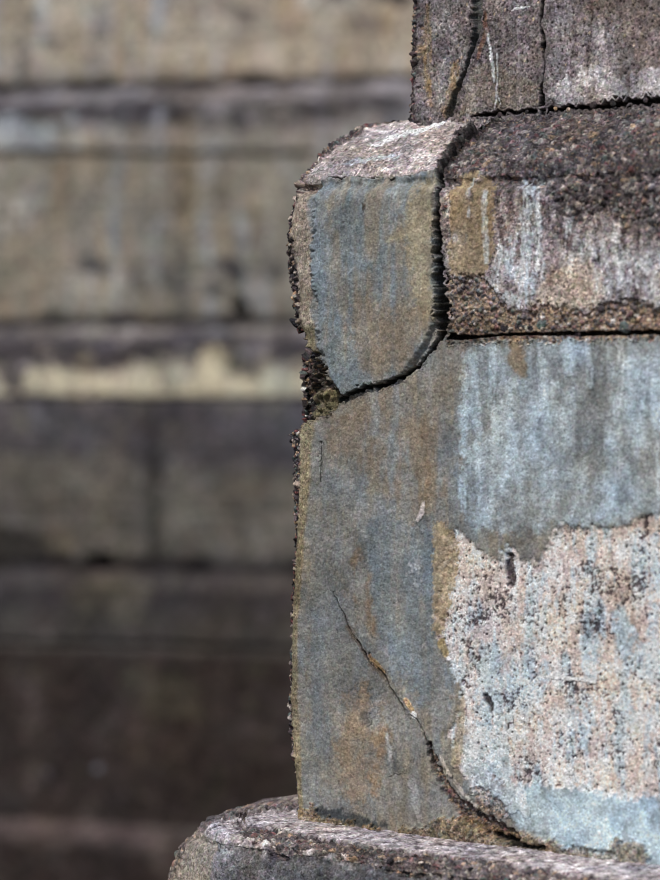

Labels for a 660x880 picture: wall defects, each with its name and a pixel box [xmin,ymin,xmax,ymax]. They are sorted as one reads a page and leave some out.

crack [536,0,552,117]
peeling [416,500,426,522]
crack [332,592,438,766]
peeling [395,512,660,864]
spalling [232,801,624,880]